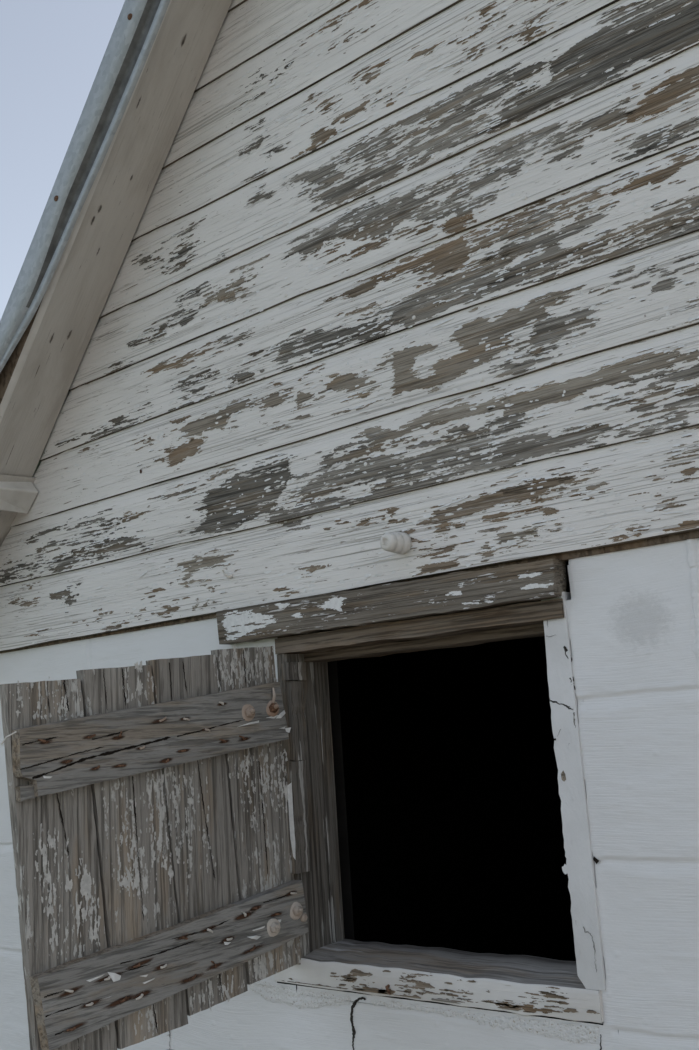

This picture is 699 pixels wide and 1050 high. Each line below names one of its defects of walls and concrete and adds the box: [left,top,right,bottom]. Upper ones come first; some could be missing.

peeling [0,0,699,692]
peeling [238,710,291,733]
peeling [228,748,288,828]
peeling [102,759,216,899]
peeling [34,823,101,961]
corrosion [235,905,280,920]
peeling [86,972,121,982]
corrosion [82,990,151,1008]
corrosion [96,958,165,982]
crack [350,997,366,1050]
peeling [190,939,600,1014]